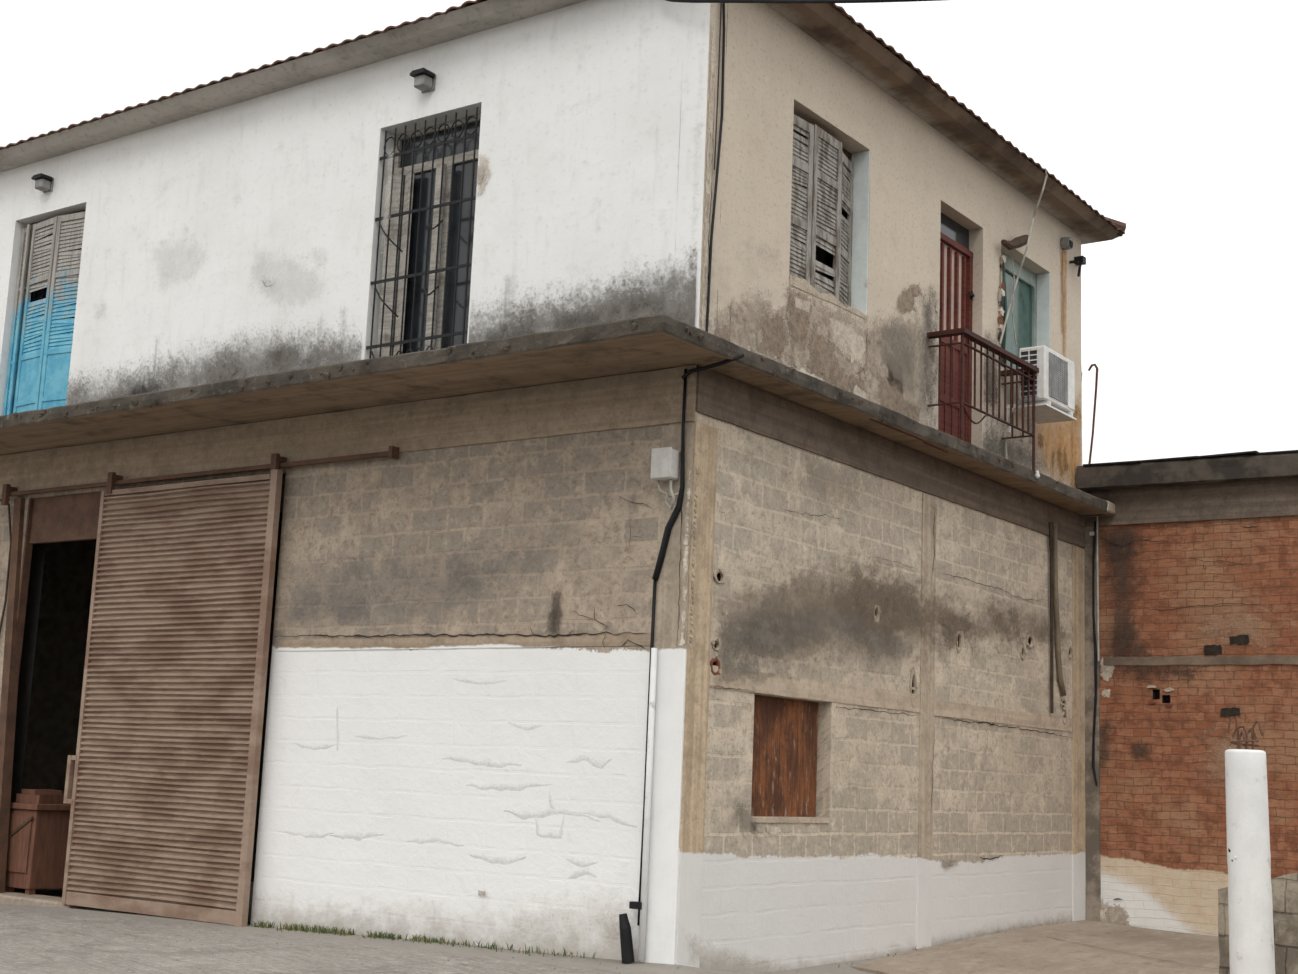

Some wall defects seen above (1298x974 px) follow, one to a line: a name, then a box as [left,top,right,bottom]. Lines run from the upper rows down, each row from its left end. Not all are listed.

flaking render [685,26,948,453]
water stain [468,249,697,343]
water stain [66,327,362,405]
corrosion [1036,407,1082,488]
water stain [723,577,921,678]